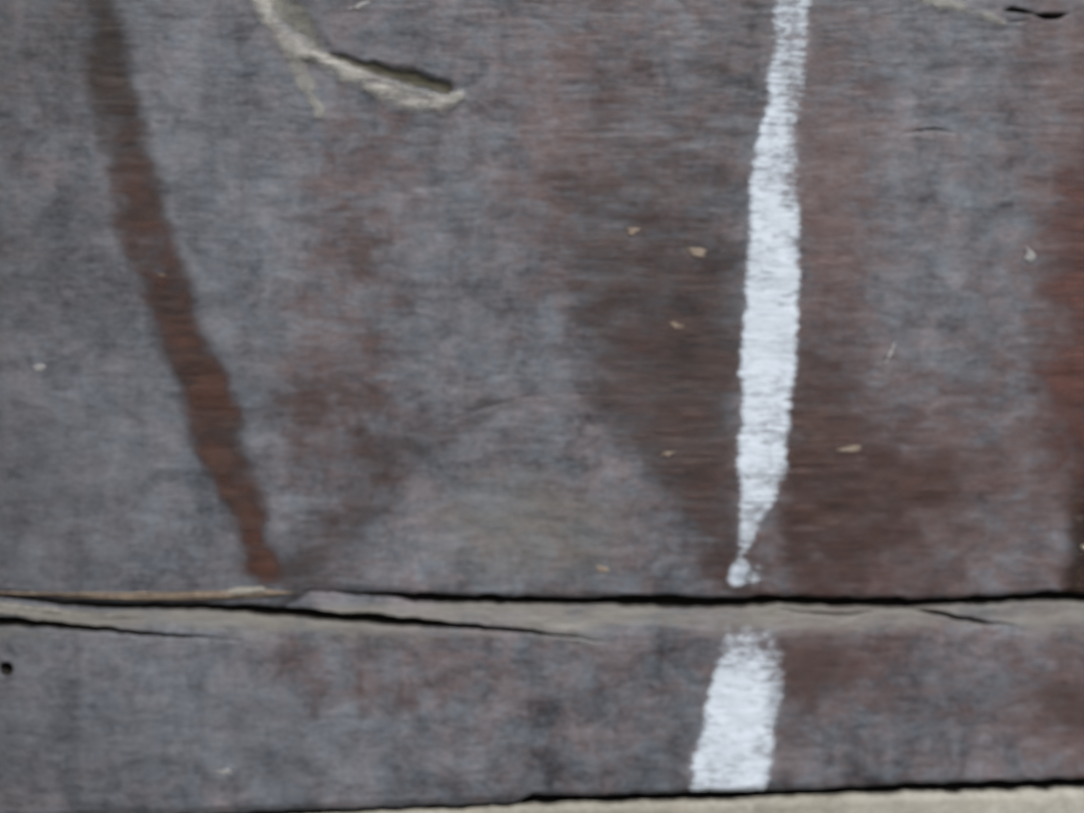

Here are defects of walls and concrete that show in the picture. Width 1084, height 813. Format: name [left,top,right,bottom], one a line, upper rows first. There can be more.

crack [1005,8,1066,19]
corrosion [88,0,281,582]
water stain [577,0,811,591]
crack [0,590,1084,639]
water stain [690,635,782,791]
crack [249,778,1084,813]